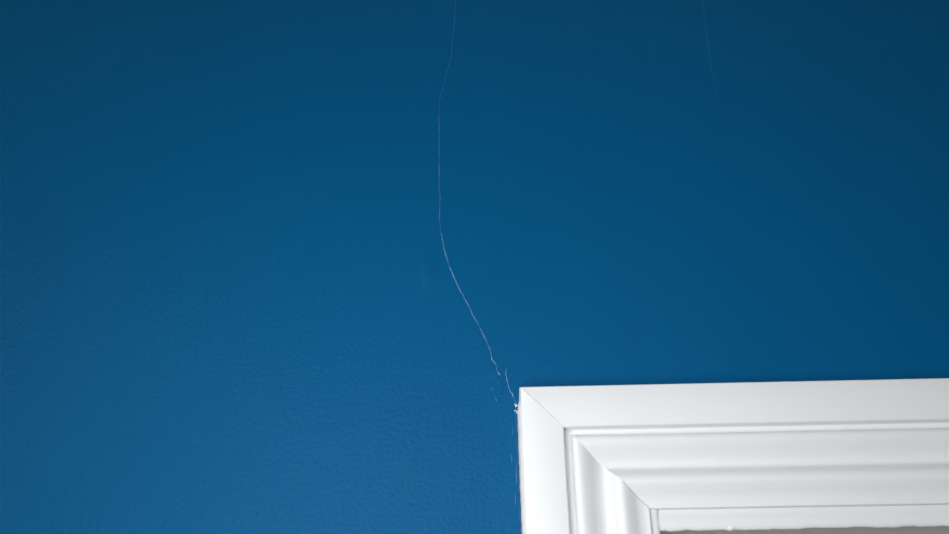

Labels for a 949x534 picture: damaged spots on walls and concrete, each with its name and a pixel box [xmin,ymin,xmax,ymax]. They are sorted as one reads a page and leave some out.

crack [438,0,562,425]